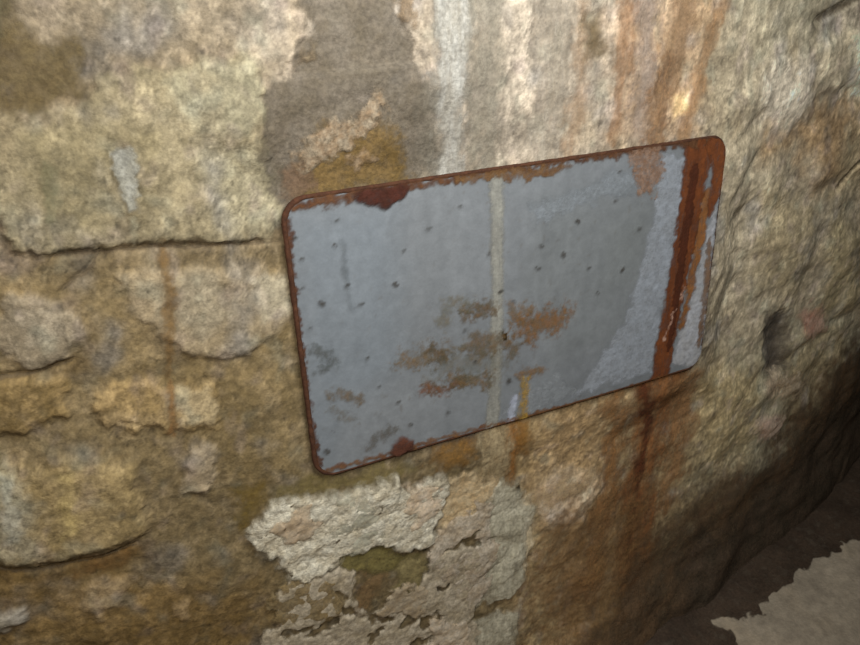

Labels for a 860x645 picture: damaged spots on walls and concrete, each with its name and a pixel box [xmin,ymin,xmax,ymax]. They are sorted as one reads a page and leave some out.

flaking render [247,472,504,645]
corrosion [286,0,727,645]